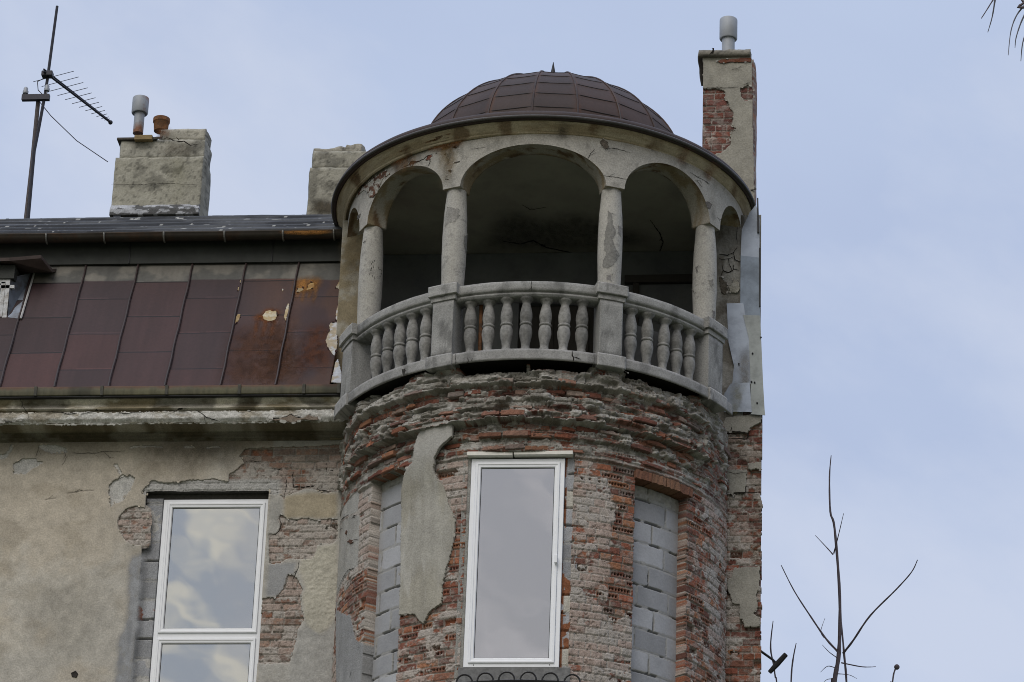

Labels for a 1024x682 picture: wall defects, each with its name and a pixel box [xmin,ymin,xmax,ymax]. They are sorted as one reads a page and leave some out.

spalling [702,89,736,155]
peeling [602,211,623,281]
crack [717,217,741,278]
peeling [263,304,289,322]
peeling [326,307,342,384]
spalling [108,445,342,548]
spalling [269,513,353,564]
peeling [398,420,456,624]
spalling [258,573,304,664]
peeling [727,565,761,628]